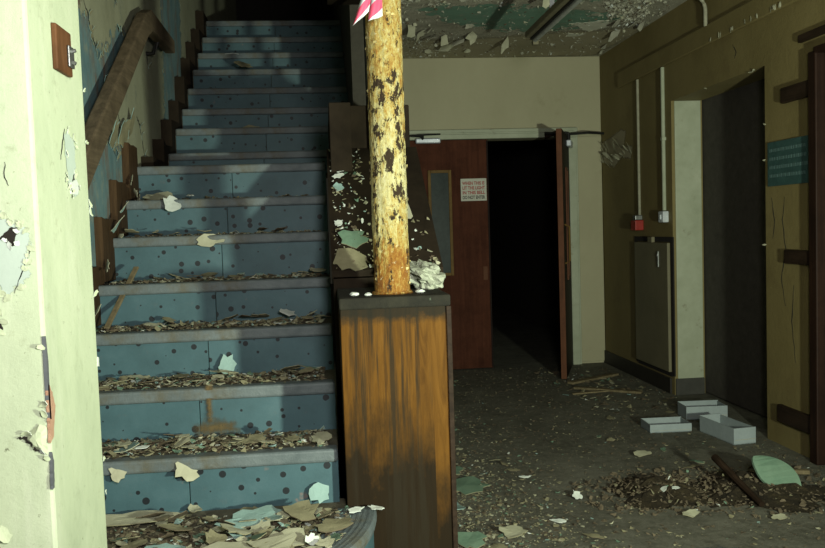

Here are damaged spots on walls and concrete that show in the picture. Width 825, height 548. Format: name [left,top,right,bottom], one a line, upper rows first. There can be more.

peeling [386,0,550,54]
peeling [551,9,622,54]
peeling [78,0,126,125]
peeling [332,173,344,191]
peeling [309,220,382,272]
peeling [0,211,35,336]
spalling [36,336,56,490]
flaking render [0,525,12,548]